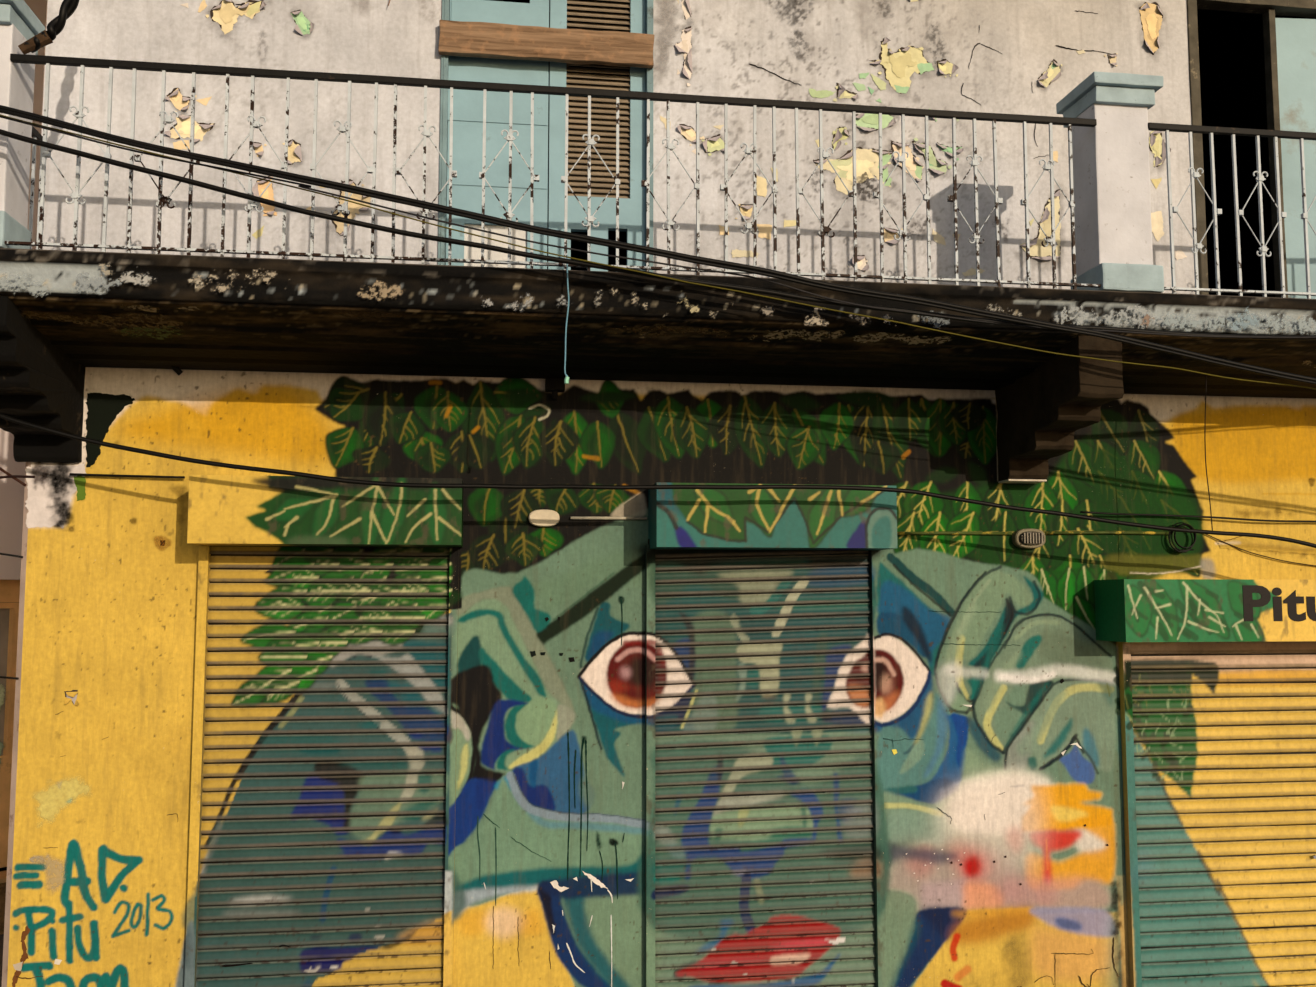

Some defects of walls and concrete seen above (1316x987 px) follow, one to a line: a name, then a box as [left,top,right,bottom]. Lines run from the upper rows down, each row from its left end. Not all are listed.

peeling [180,0,267,35]
peeling [1139,2,1163,55]
peeling [165,88,216,150]
peeling [809,37,964,195]
peeling [1149,131,1171,189]
peeling [252,176,277,239]
peeling [1020,189,1061,260]
peeling [0,273,200,340]
peeling [76,264,152,294]
peeling [189,269,276,292]
peeling [340,281,403,320]
peeling [485,294,533,310]